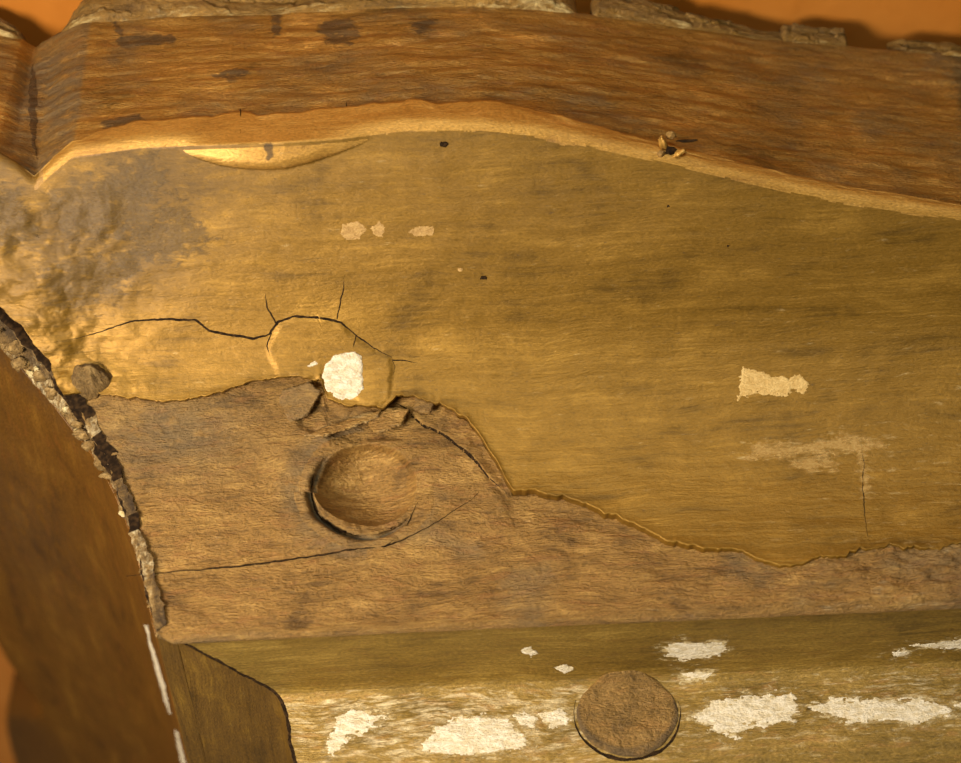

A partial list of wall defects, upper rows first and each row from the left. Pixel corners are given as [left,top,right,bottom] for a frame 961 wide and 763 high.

crack [0,285,507,763]
peeling [81,352,961,715]
peeling [175,730,186,763]
peeling [322,705,389,757]
peeling [417,704,575,760]
peeling [681,686,961,745]